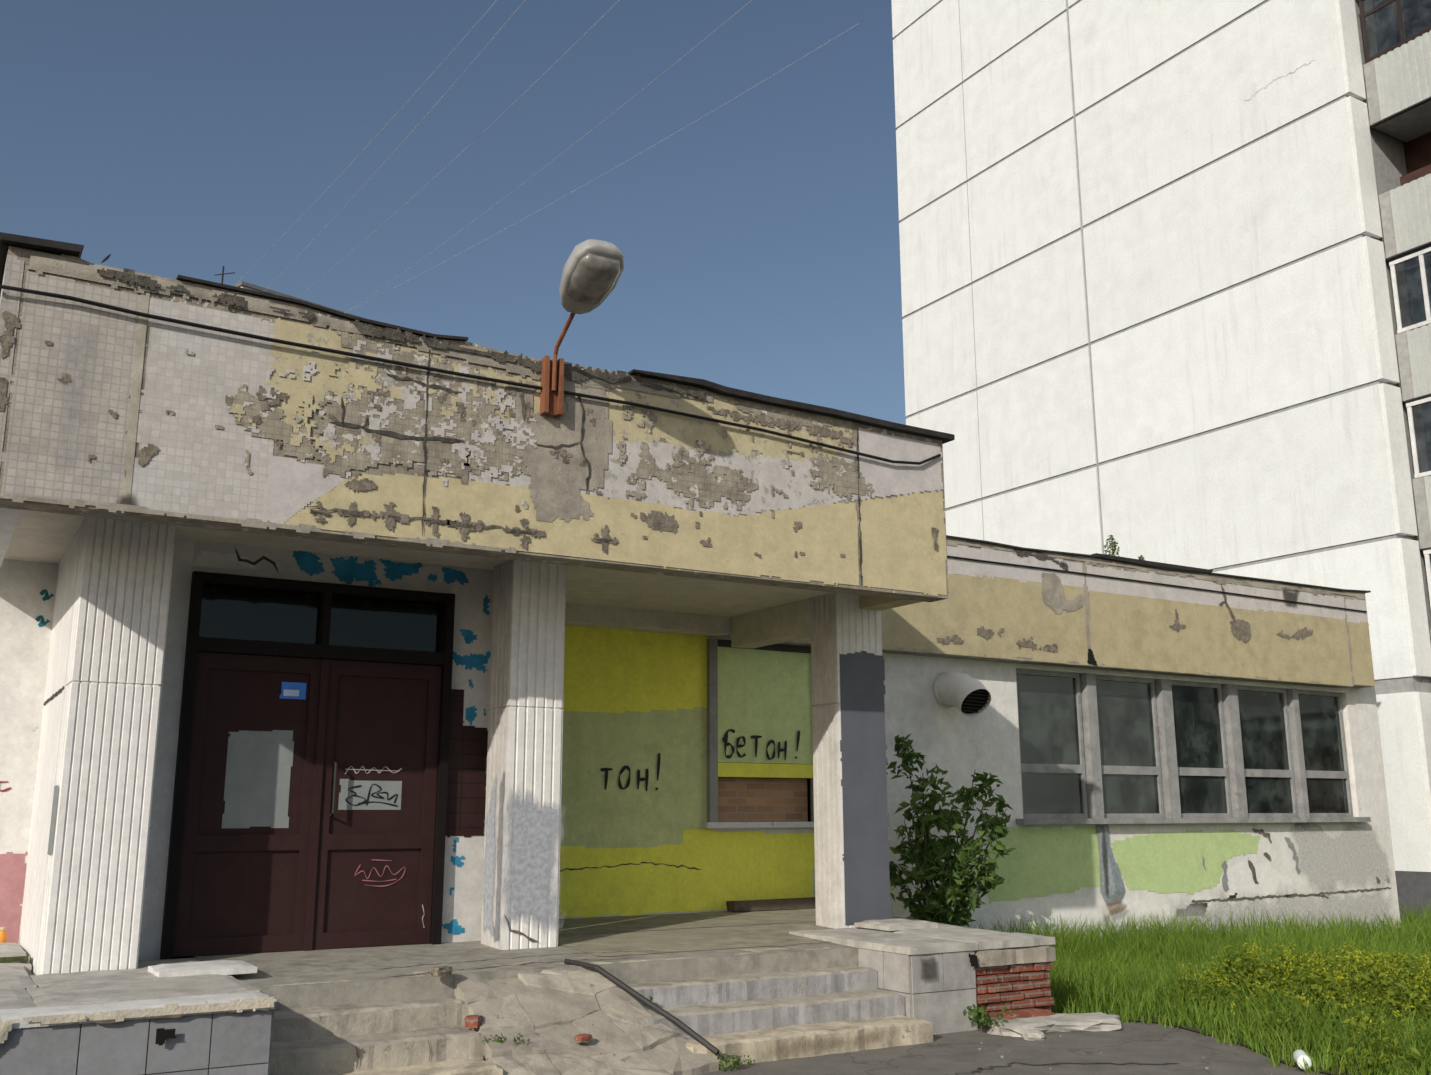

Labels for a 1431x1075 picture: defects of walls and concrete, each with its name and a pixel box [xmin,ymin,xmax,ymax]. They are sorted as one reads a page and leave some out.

peeling [0,254,874,553]
crack [507,387,591,493]
spalling [931,527,1365,614]
spalling [1169,609,1186,632]
spalling [1230,619,1251,644]
spalling [1277,627,1313,640]
peeling [1248,822,1390,888]
peeling [1202,856,1229,892]
spalling [0,1019,13,1043]
crack [955,1062,1179,1075]